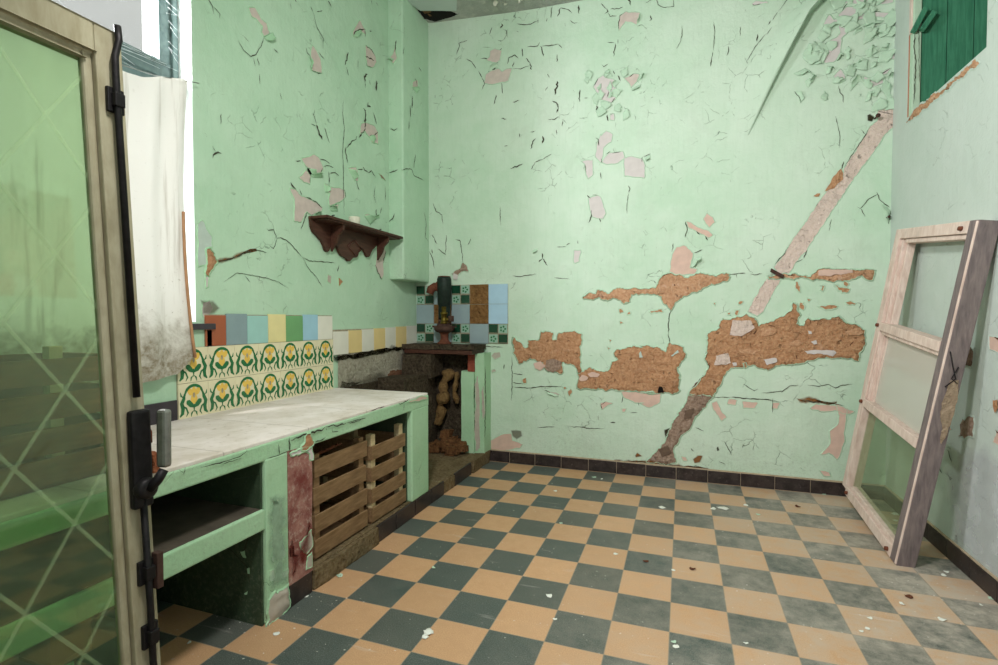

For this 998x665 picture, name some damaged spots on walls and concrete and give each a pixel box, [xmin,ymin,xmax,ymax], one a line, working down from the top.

crack [710,0,787,66]
crack [456,0,674,169]
spalling [906,57,981,123]
crack [312,54,413,199]
peeling [289,154,386,228]
crack [219,229,334,287]
crack [424,204,471,265]
crack [515,243,569,279]
spalling [474,0,896,465]
spalling [965,345,975,368]
spalling [959,414,976,441]